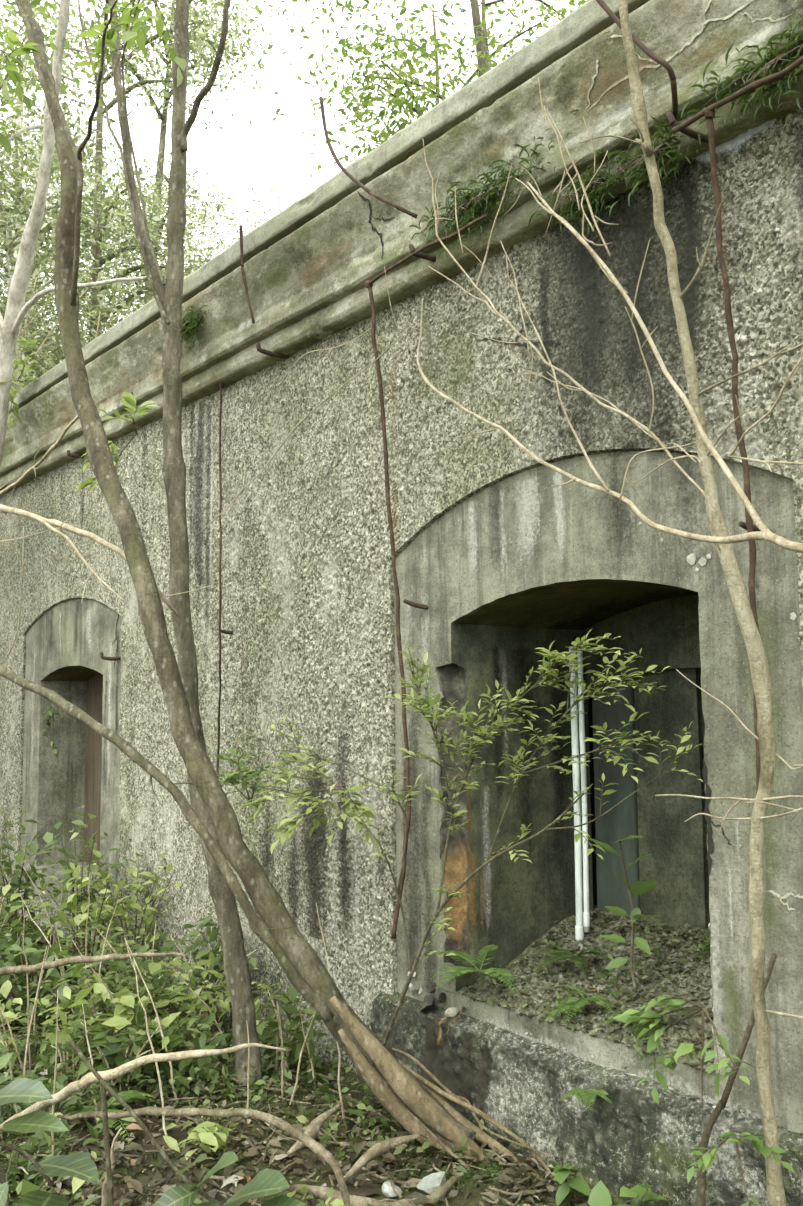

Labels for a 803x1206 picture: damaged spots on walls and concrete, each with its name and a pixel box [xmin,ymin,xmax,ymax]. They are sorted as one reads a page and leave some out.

crack [357,191,395,259]
water stain [182,404,214,627]
water stain [519,480,540,548]
water stain [548,589,698,630]
water stain [288,834,299,922]
water stain [320,738,358,935]
rust [442,780,484,940]